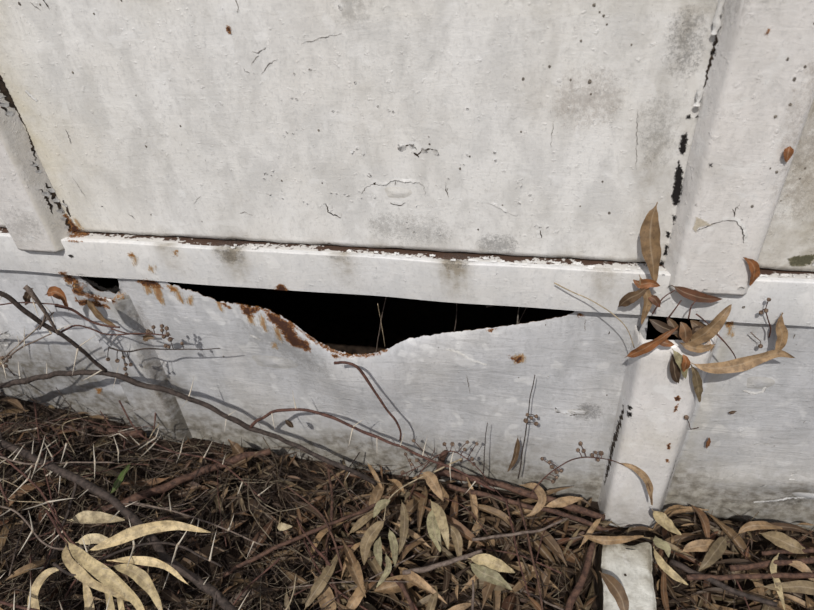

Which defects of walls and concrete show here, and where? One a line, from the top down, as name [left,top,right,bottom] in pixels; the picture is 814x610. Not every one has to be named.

crack [703,34,718,89]
crack [0,75,38,161]
crack [361,177,448,206]
corrosion [63,214,89,242]
crack [697,205,749,258]
corrosion [58,271,125,310]
peeling [80,276,120,293]
corrosion [137,265,193,305]
peeling [780,253,814,277]
corrosion [215,301,388,359]
crack [604,404,624,485]